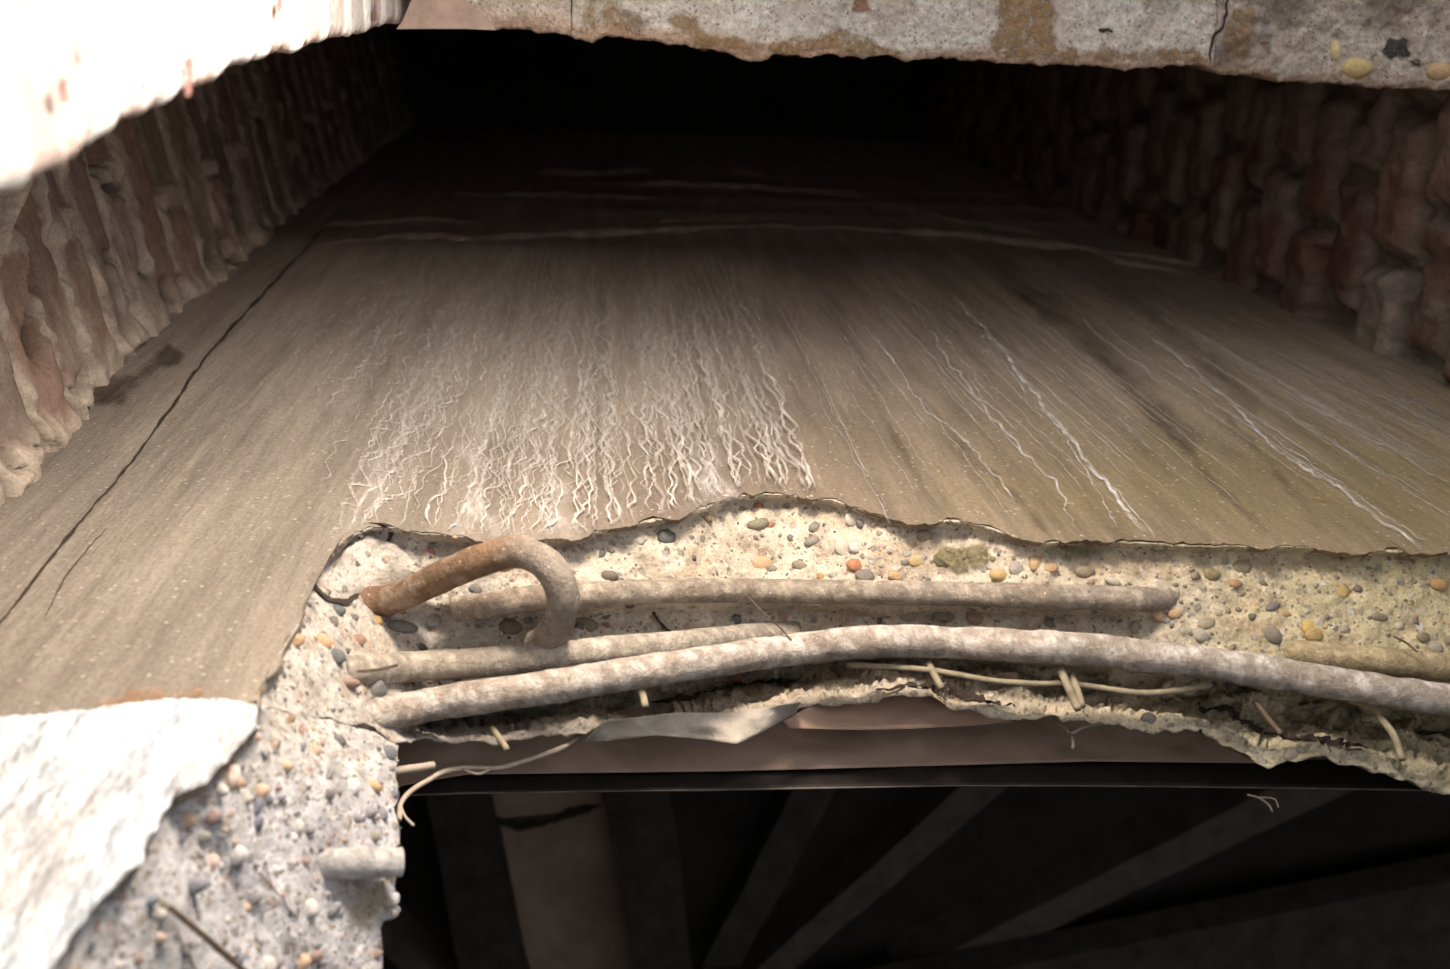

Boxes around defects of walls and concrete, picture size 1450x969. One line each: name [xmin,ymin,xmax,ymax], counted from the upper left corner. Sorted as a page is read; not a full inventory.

crack [1208,0,1228,66]
leakage [290,242,813,534]
crack [0,166,1198,624]
leakage [898,288,1036,462]
leakage [953,296,1139,519]
leakage [1159,343,1412,541]
crack [652,611,671,631]
spalling [0,493,1450,969]